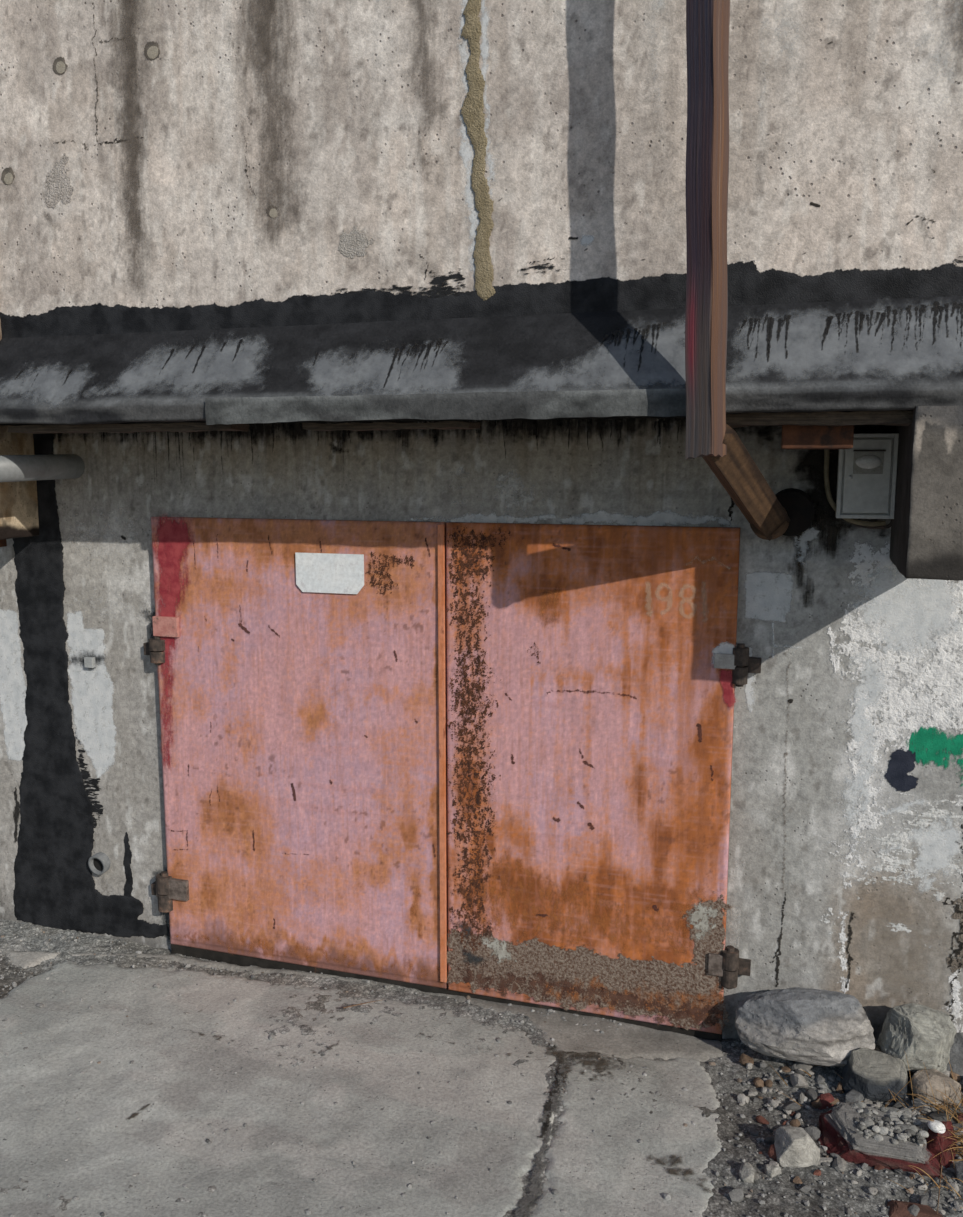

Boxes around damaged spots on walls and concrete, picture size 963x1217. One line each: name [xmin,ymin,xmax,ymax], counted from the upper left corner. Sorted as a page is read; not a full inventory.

damp [114,0,143,286]
damp [242,0,298,238]
corrosion [364,551,415,594]
corrosion [444,525,733,1030]
crack [772,733,788,987]
peeling [829,536,963,1033]
crack [942,807,963,1021]
crack [509,1064,565,1217]